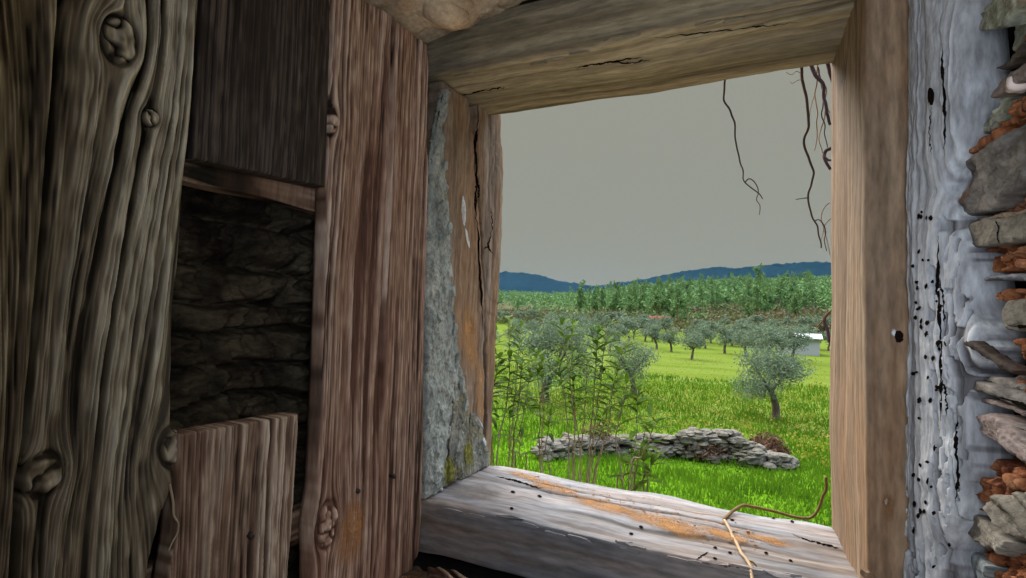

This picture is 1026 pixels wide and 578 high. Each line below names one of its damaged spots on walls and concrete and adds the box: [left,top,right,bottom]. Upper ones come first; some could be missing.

crack [463,87,504,327]